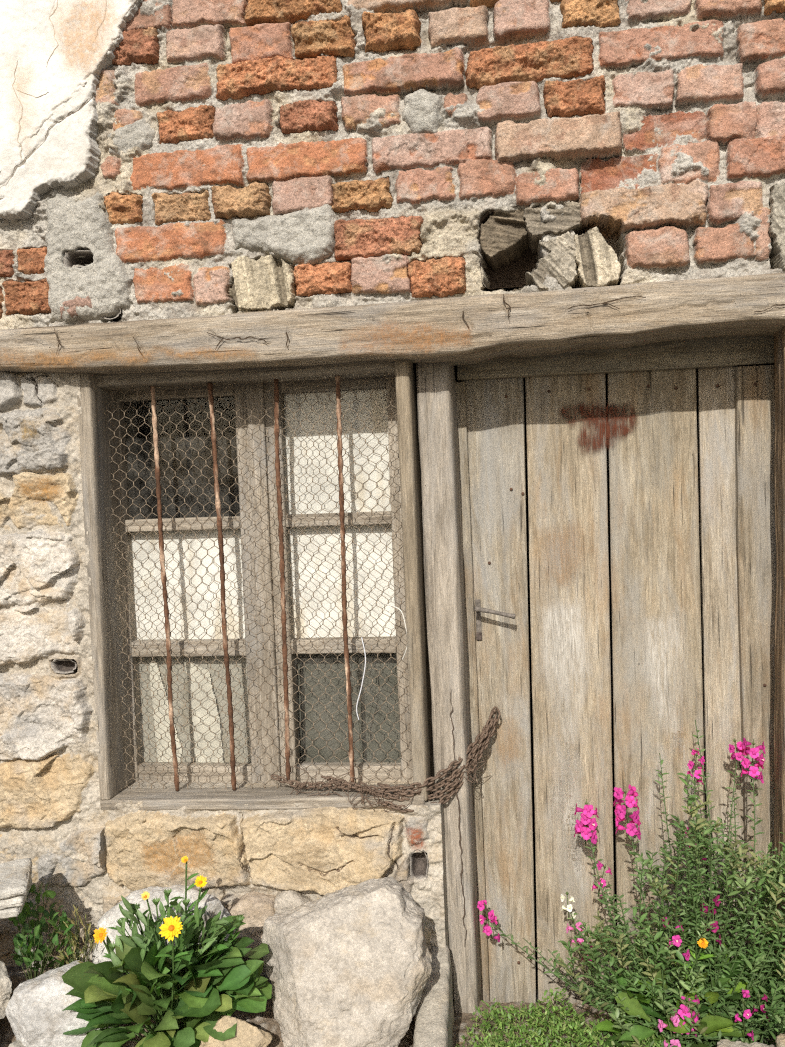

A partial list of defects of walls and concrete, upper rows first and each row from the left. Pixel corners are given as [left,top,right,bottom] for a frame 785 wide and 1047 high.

crack [0,65,95,200]
flaking render [0,0,160,221]
corrosion [562,404,636,450]